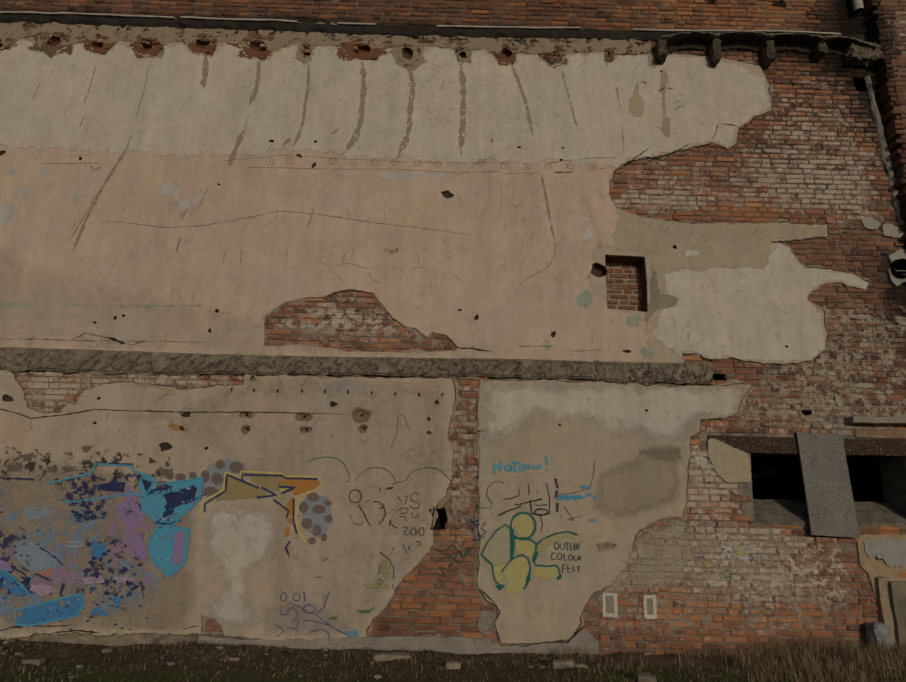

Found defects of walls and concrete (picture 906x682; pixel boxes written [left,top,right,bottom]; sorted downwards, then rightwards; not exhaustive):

leakage [294,46,316,142]
spalling [0,9,671,137]
leakage [337,37,427,159]
leakage [455,50,471,155]
leakage [496,43,533,133]
leakage [547,50,579,131]
spalling [262,289,458,353]
spalling [552,48,906,656]
spalling [0,369,597,645]